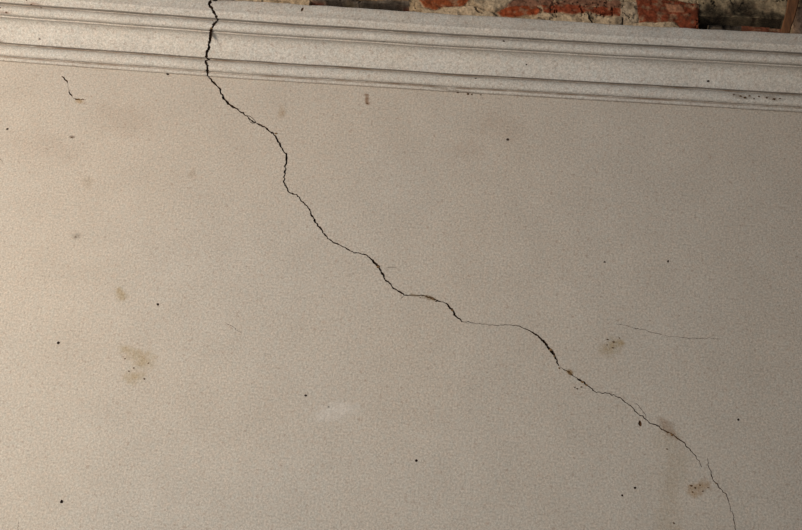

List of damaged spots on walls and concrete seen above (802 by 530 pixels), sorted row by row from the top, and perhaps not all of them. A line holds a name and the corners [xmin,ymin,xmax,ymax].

crack [205,0,736,530]